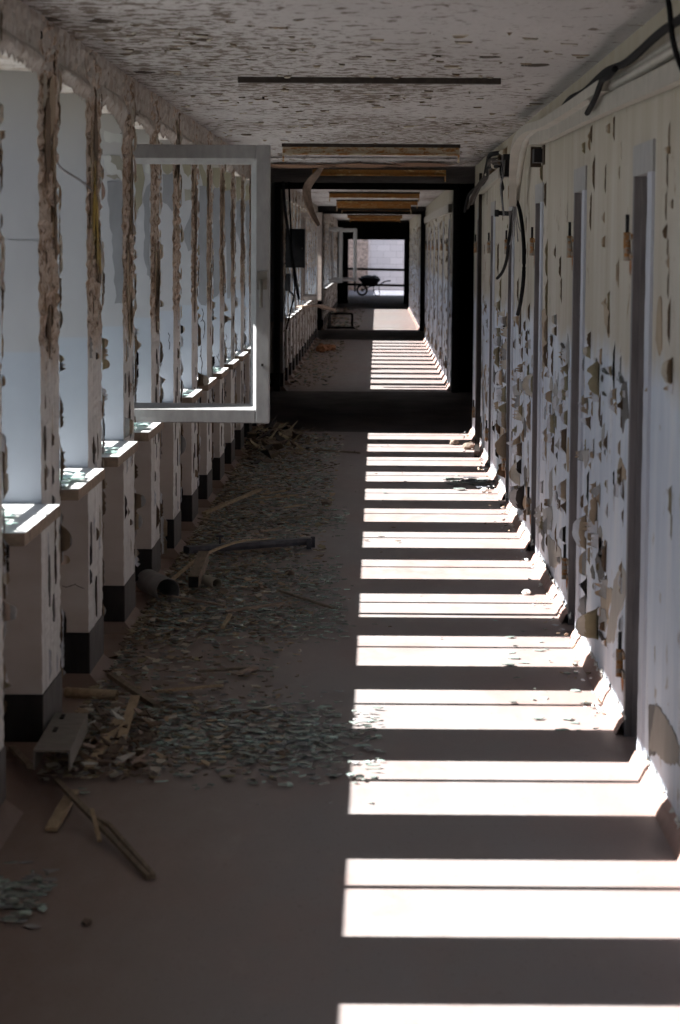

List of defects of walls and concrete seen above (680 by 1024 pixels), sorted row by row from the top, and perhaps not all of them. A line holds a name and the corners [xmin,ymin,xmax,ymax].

peeling [43,42,66,371]
peeling [133,66,196,145]
peeling [88,88,251,438]
peeling [581,126,606,247]
peeling [655,124,673,394]
peeling [44,393,72,679]
peeling [90,388,108,617]
peeling [125,455,167,583]
peeling [175,423,237,511]
peeling [480,225,629,724]
peeling [642,704,680,829]